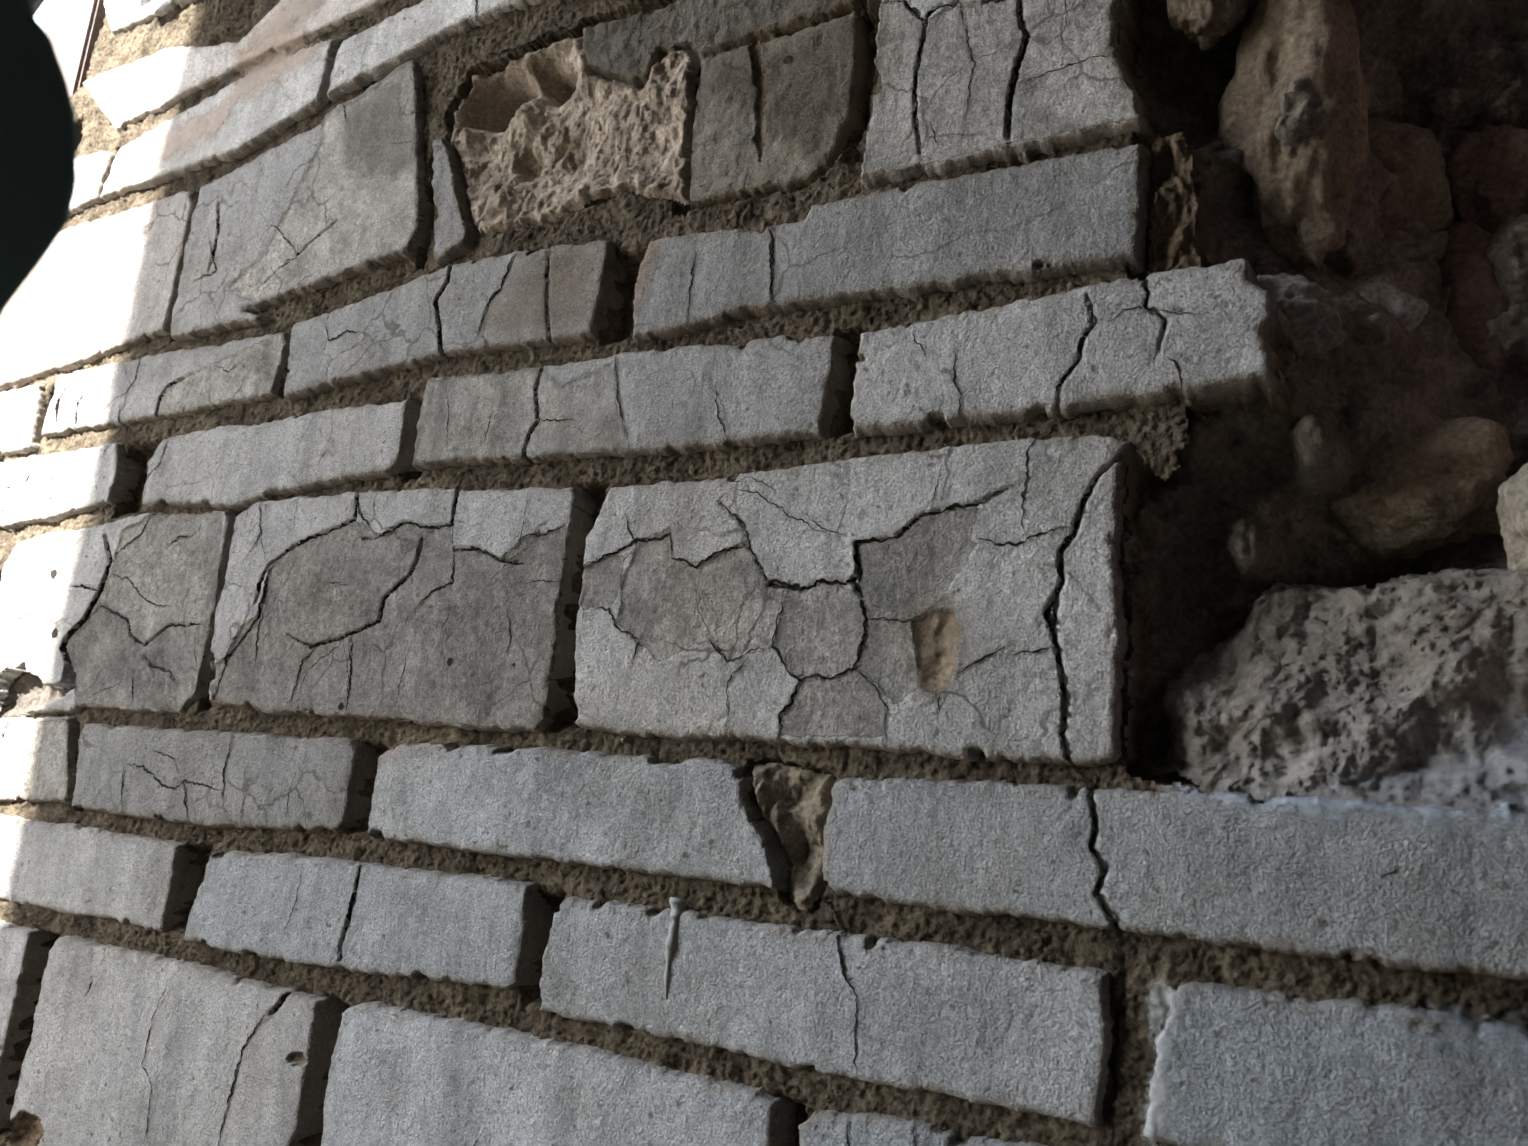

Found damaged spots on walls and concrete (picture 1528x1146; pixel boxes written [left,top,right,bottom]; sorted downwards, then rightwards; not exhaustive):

crack [196,203,220,280]
spalling [451,36,701,238]
crack [735,209,777,303]
crack [887,0,1121,153]
spalling [1148,132,1200,276]
peeling [0,507,978,801]
crack [0,223,1208,1146]
spalling [753,763,836,910]